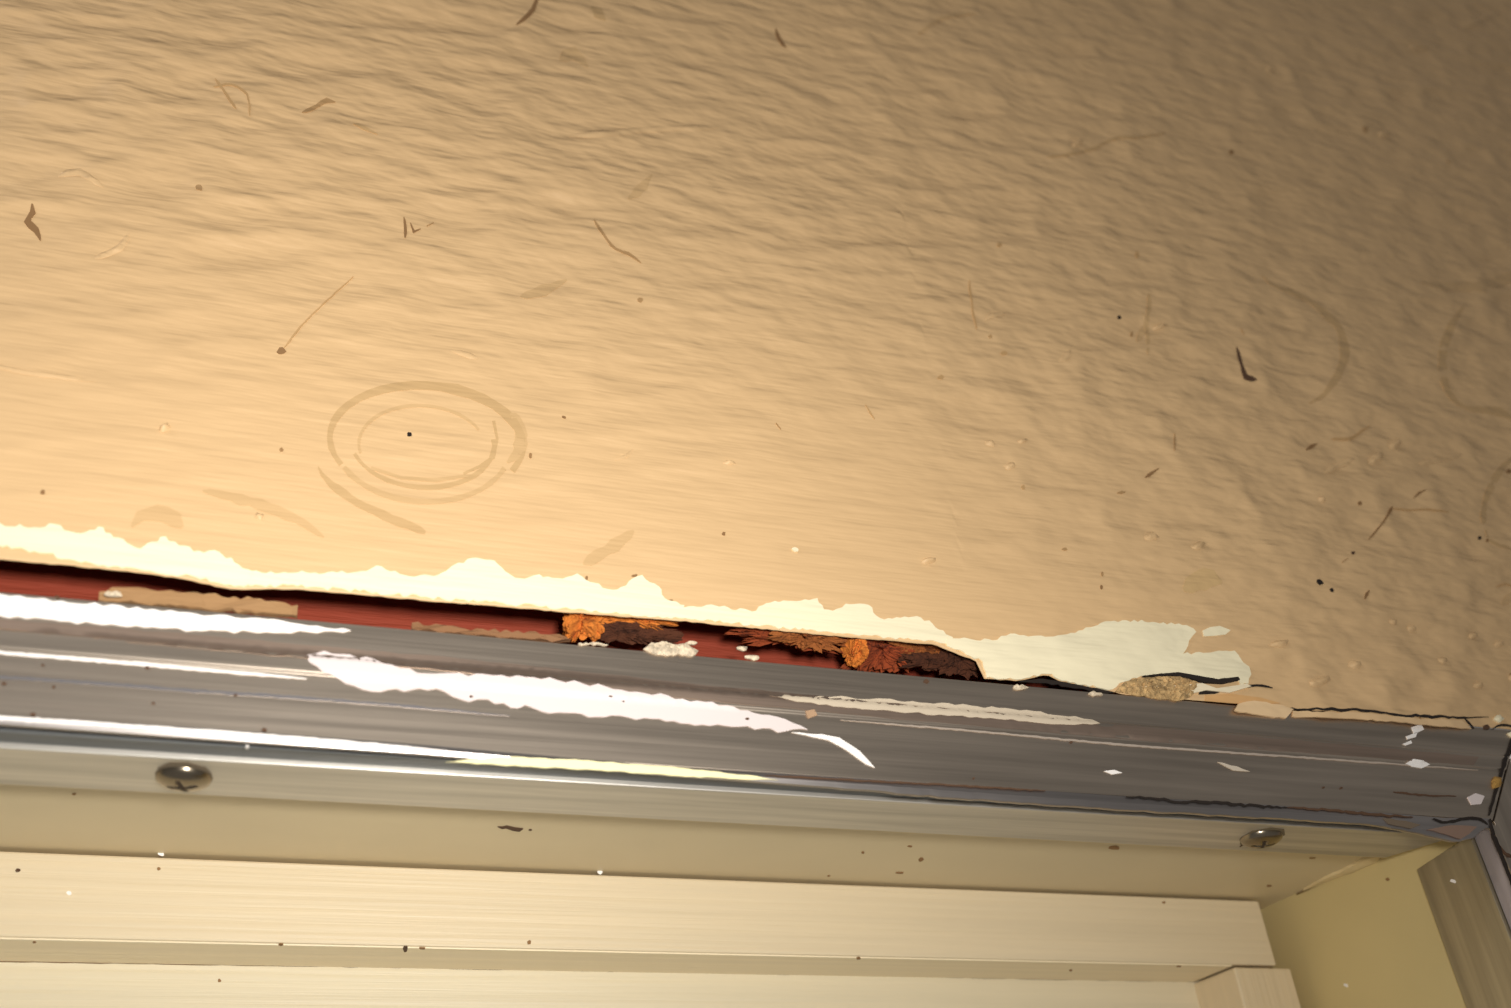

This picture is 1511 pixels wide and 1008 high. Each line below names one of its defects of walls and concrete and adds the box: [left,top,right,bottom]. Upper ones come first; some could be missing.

peeling [0,523,1472,729]